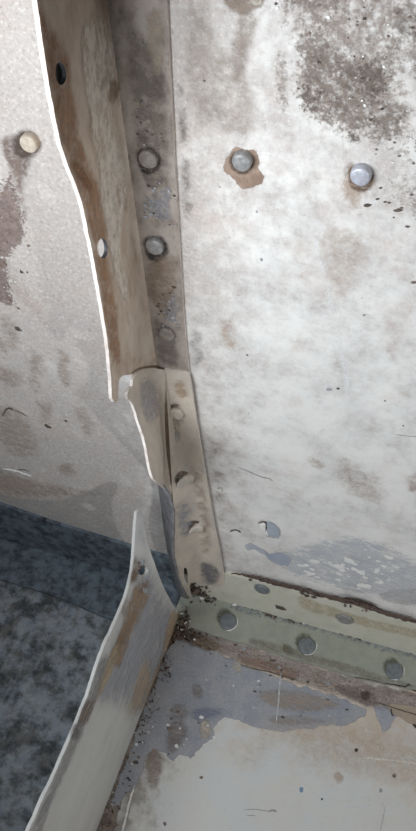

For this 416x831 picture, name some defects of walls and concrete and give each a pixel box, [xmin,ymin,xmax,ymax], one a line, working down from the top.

peeling [110,637,416,831]